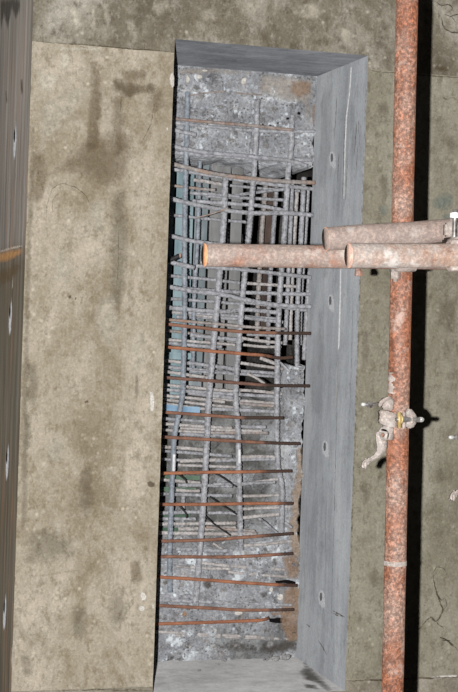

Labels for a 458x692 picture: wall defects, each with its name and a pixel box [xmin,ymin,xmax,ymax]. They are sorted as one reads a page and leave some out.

spalling [152,65,317,666]
rust [284,452,302,577]
rust [275,587,300,640]
crack [419,567,453,645]